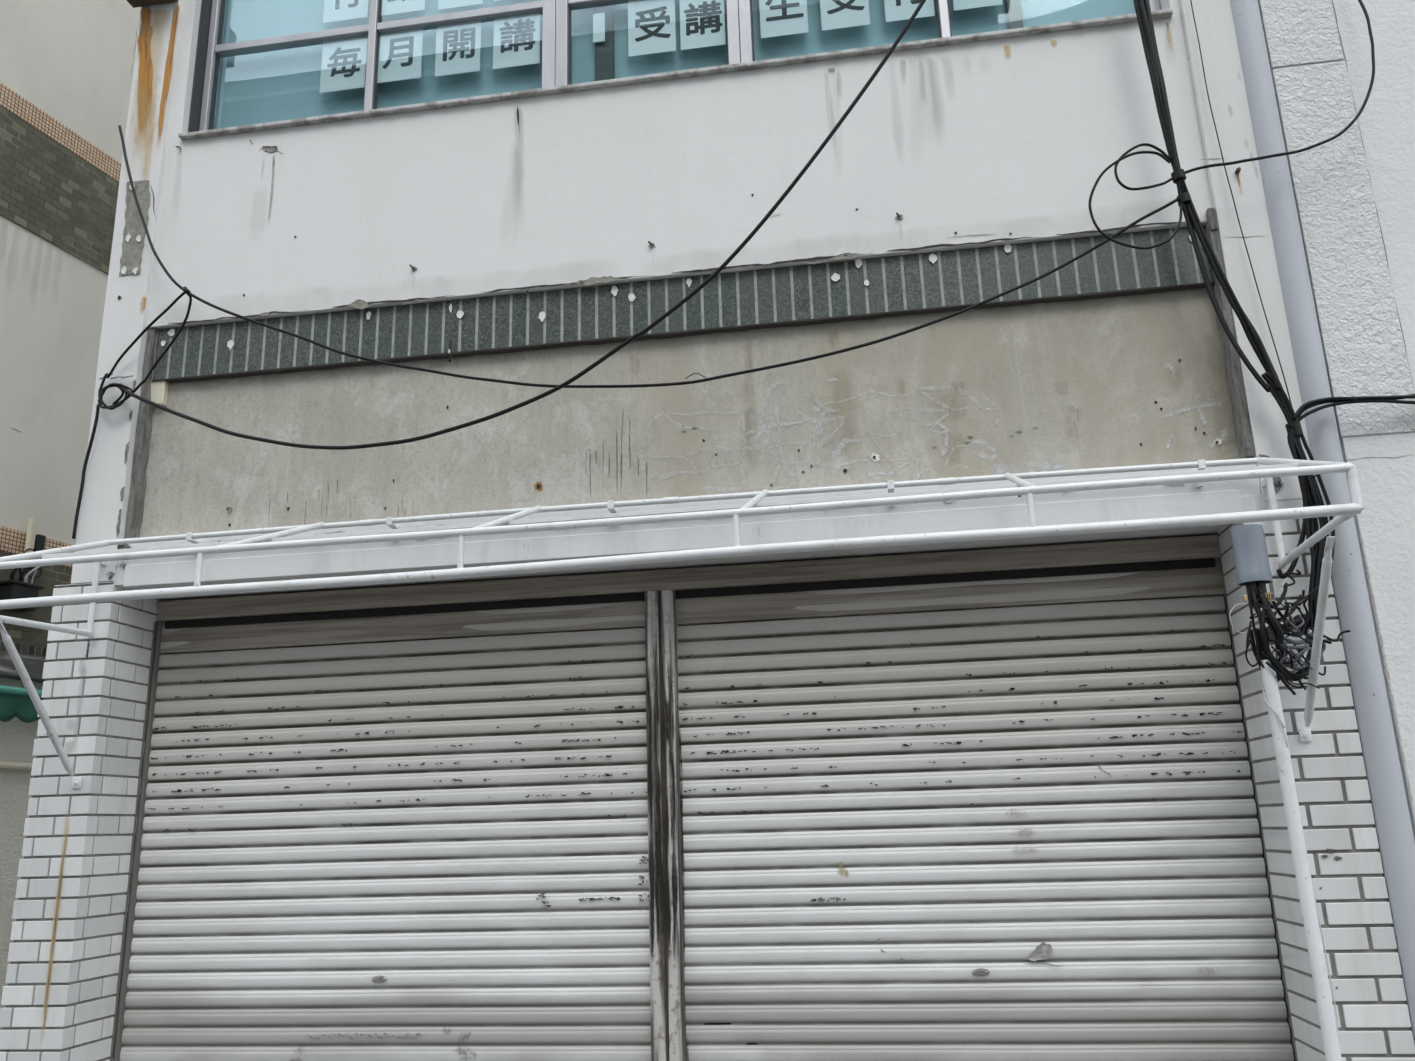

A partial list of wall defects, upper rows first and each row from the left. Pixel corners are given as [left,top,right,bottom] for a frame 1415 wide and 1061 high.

corrosion [138,5,179,138]